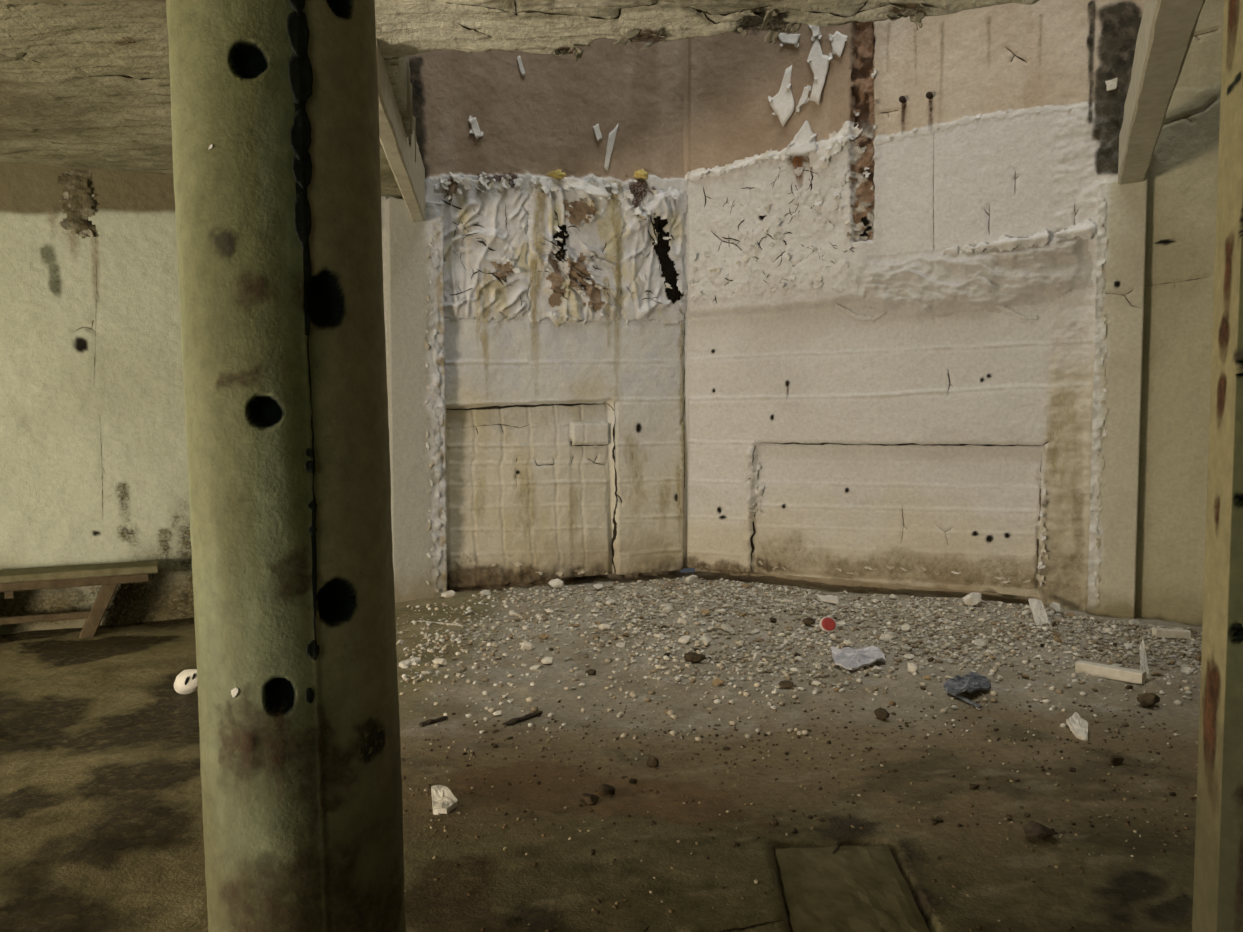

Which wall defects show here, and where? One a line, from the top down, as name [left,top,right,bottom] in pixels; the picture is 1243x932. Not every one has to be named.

crack [446,0,658,38]
crack [690,0,923,24]
damp [41,246,60,293]
peeling [424,3,1088,592]
crack [448,403,622,574]
crack [748,441,1049,589]